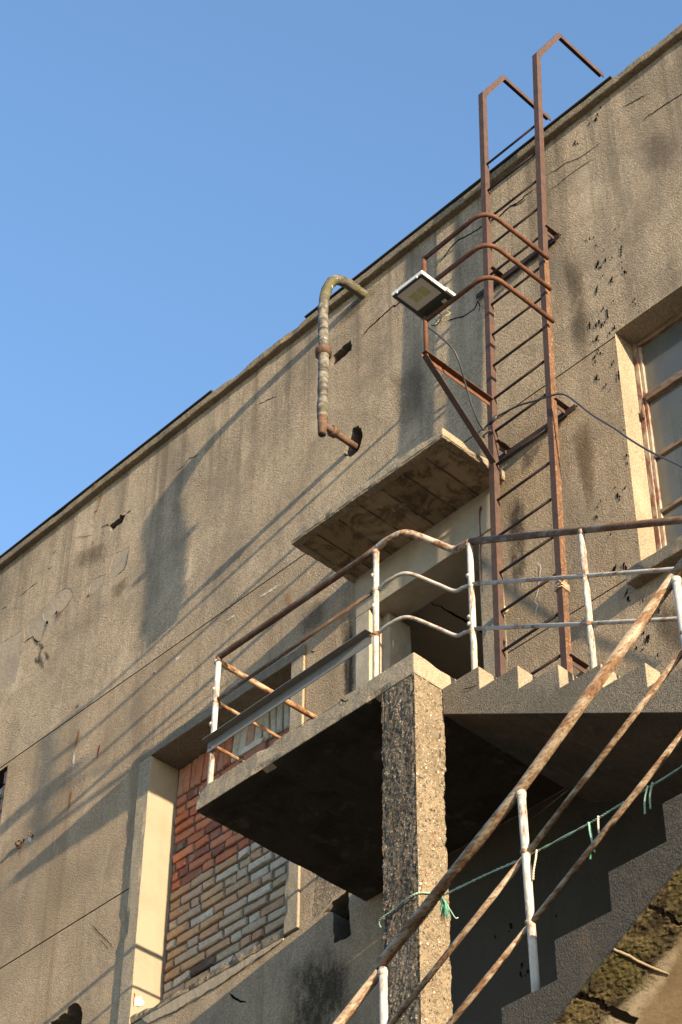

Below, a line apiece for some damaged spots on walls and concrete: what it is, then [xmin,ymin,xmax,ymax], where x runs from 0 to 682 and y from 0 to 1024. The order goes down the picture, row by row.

crack [443,146,596,258]
spalling [589,300,620,391]